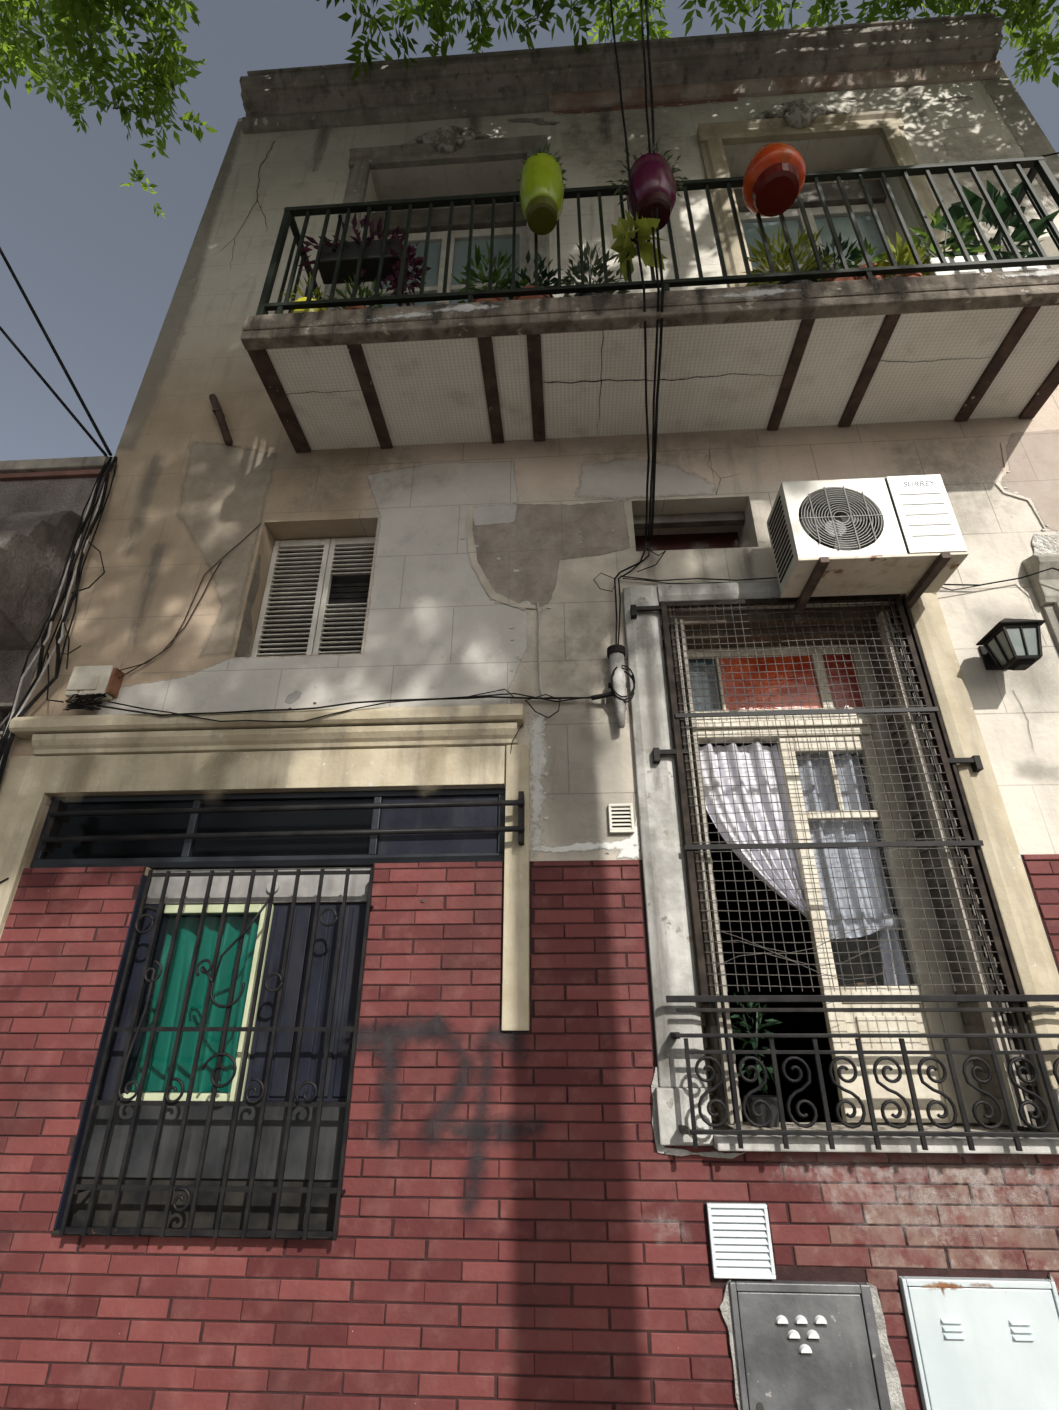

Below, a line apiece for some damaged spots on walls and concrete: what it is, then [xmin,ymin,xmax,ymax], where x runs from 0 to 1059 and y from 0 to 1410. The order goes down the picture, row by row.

crack [886,356,987,364]
flaking render [995,430,1059,555]
flaking render [461,500,629,613]